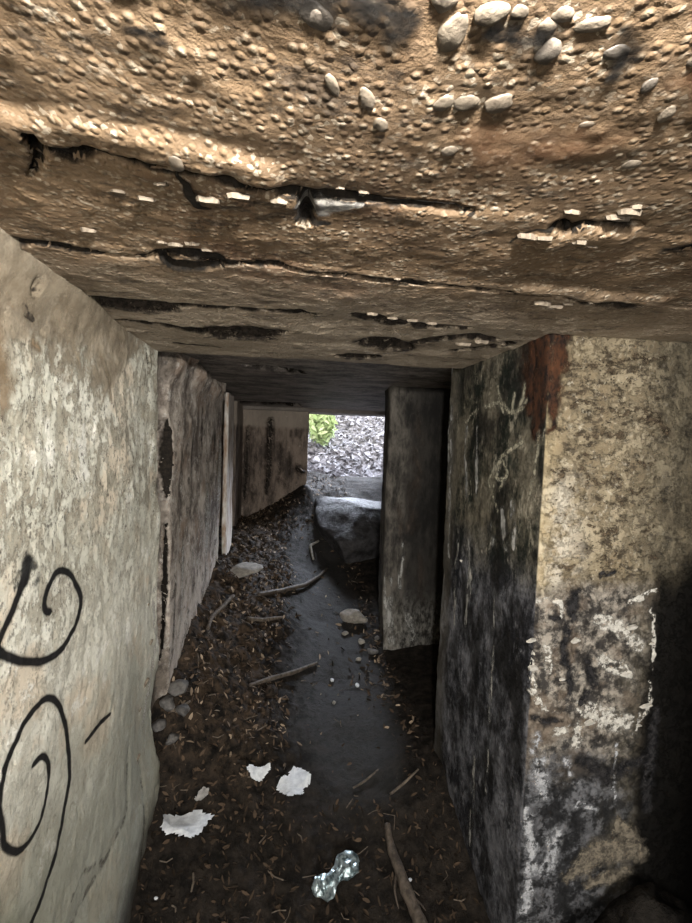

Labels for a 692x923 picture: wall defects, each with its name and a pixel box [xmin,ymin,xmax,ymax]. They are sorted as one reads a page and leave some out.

crack [20,133,475,223]
spalling [98,296,322,348]
spalling [334,312,517,360]
rust [523,334,571,441]
damp [464,426,478,493]
damp [448,407,472,626]
damp [490,500,516,552]